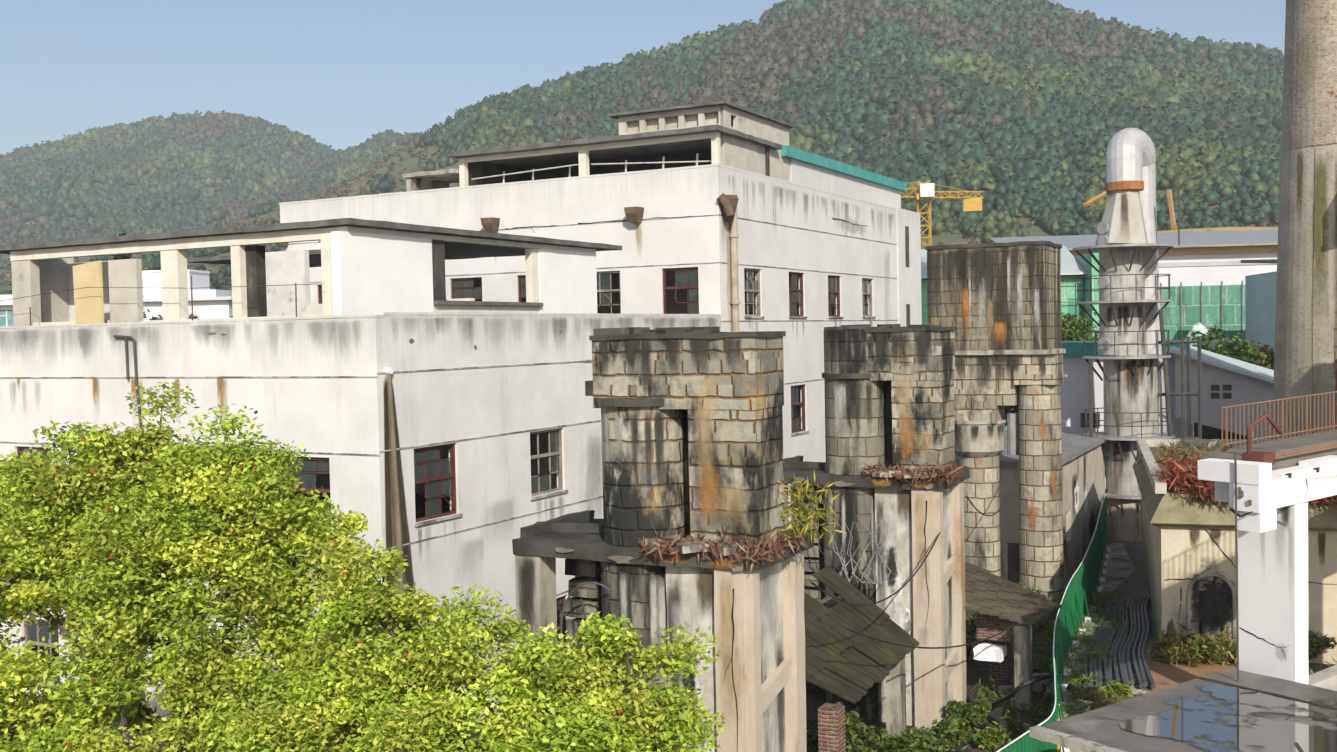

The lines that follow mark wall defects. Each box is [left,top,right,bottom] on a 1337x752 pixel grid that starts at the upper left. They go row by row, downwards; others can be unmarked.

damp [1297,155,1327,278]
rust [995,323,1004,336]
rust [700,461,719,515]
crack [722,588,738,751]